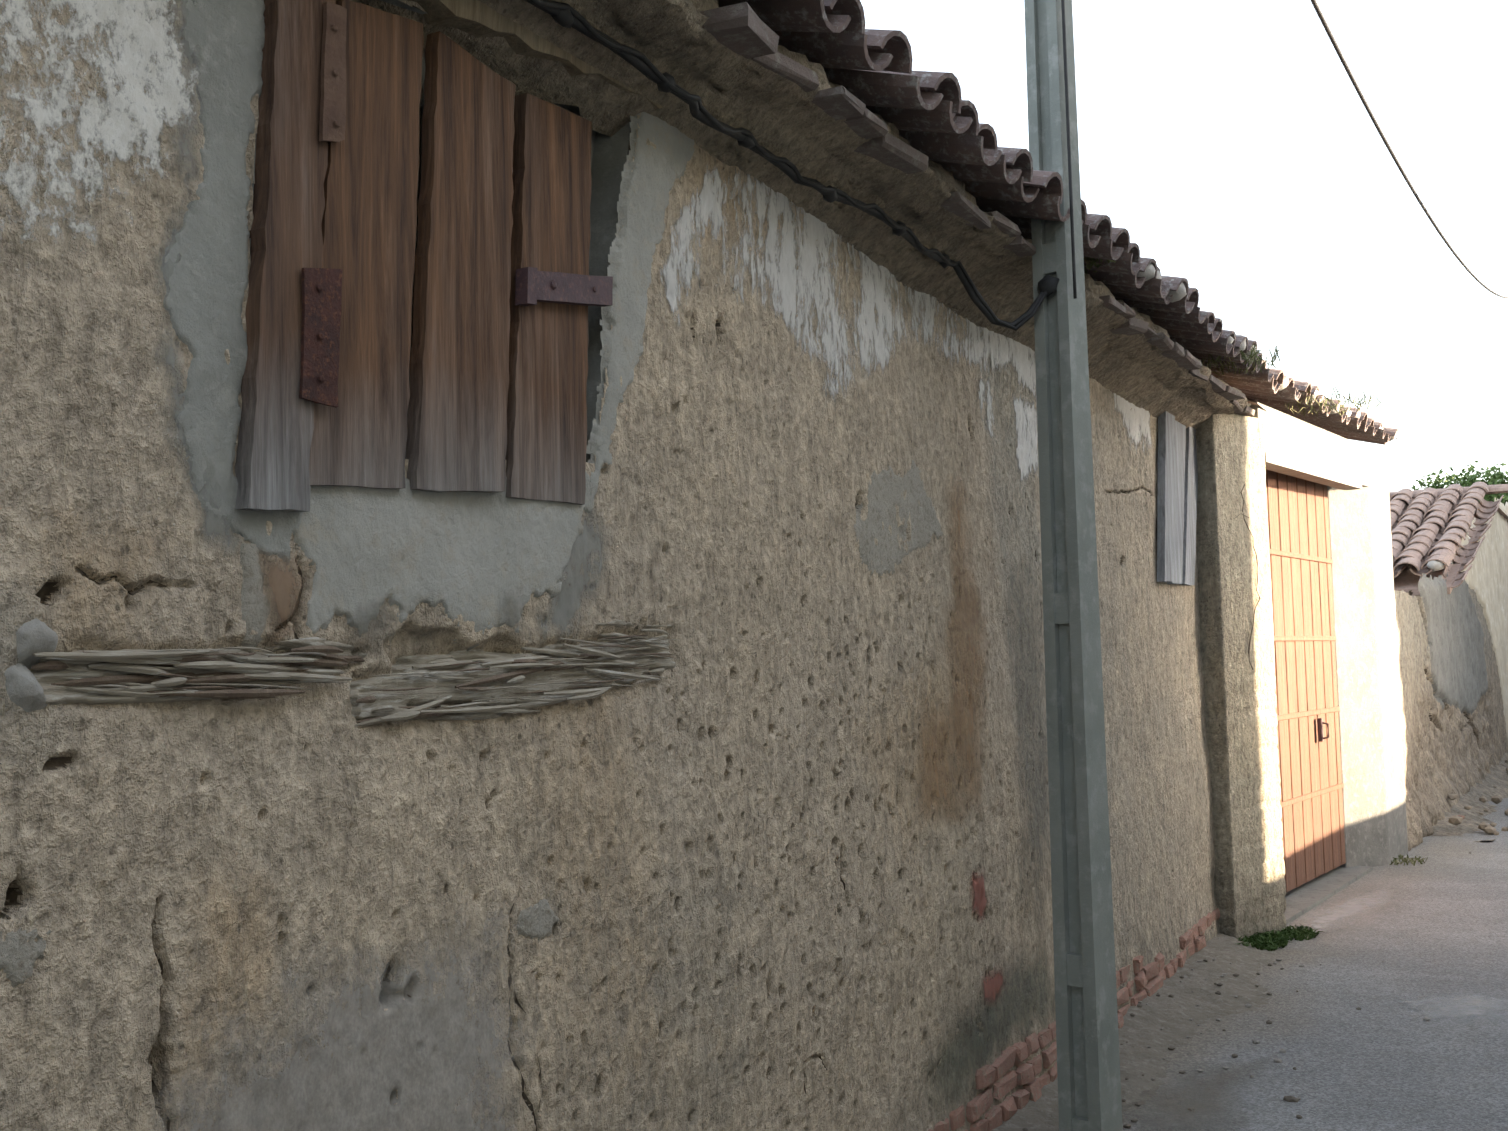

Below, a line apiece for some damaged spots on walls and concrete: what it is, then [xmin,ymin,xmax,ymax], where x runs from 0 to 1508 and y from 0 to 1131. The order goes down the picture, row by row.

peeling [0,0,198,239]
peeling [661,165,1039,480]
crack [75,567,167,595]
crack [1235,484,1261,670]
crack [155,1105,171,1131]
crack [507,904,541,1131]